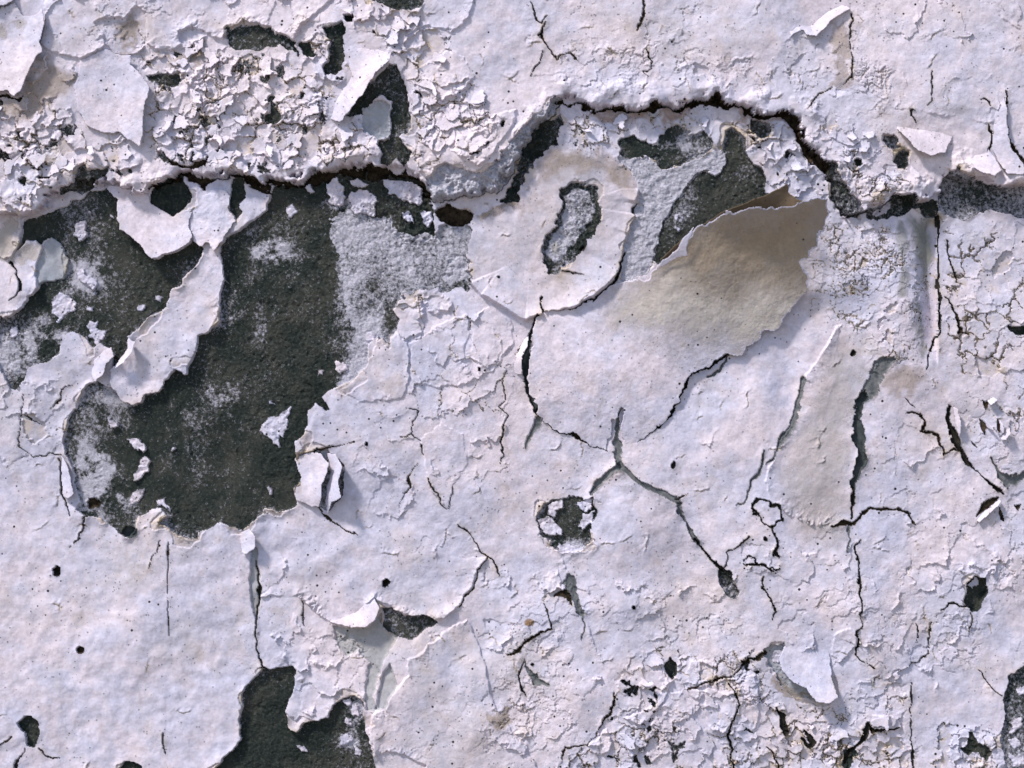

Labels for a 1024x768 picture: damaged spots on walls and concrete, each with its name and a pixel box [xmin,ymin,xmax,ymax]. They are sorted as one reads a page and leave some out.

crack [148,148,434,203]
peeling [0,0,528,618]
peeling [426,95,1024,450]
peeling [536,496,598,554]
crack [499,297,807,621]
crack [803,215,1024,669]
peeling [217,598,438,768]
crack [507,573,586,696]
crack [687,650,767,768]
peeling [557,629,1024,768]
crack [767,707,817,768]
crack [843,602,973,768]